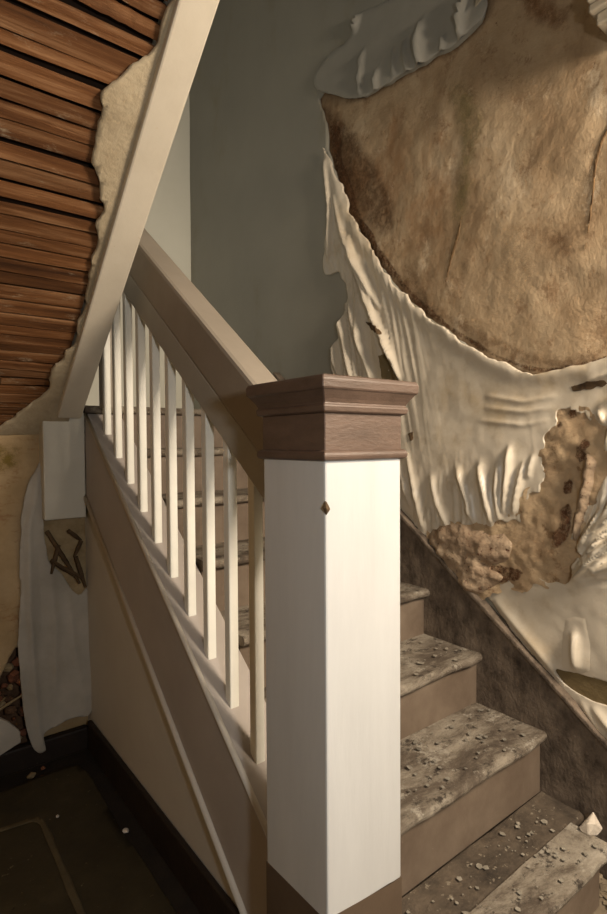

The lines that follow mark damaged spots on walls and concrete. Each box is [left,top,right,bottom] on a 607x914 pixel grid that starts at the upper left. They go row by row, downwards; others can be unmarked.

spalling [5,0,159,59]
spalling [0,43,109,90]
spalling [0,97,95,130]
spalling [0,74,102,114]
spalling [0,136,95,169]
spalling [0,177,104,206]
crack [585,129,607,249]
spalling [0,196,98,235]
flaking render [313,0,607,739]
crack [571,380,607,391]
peeling [0,462,92,753]